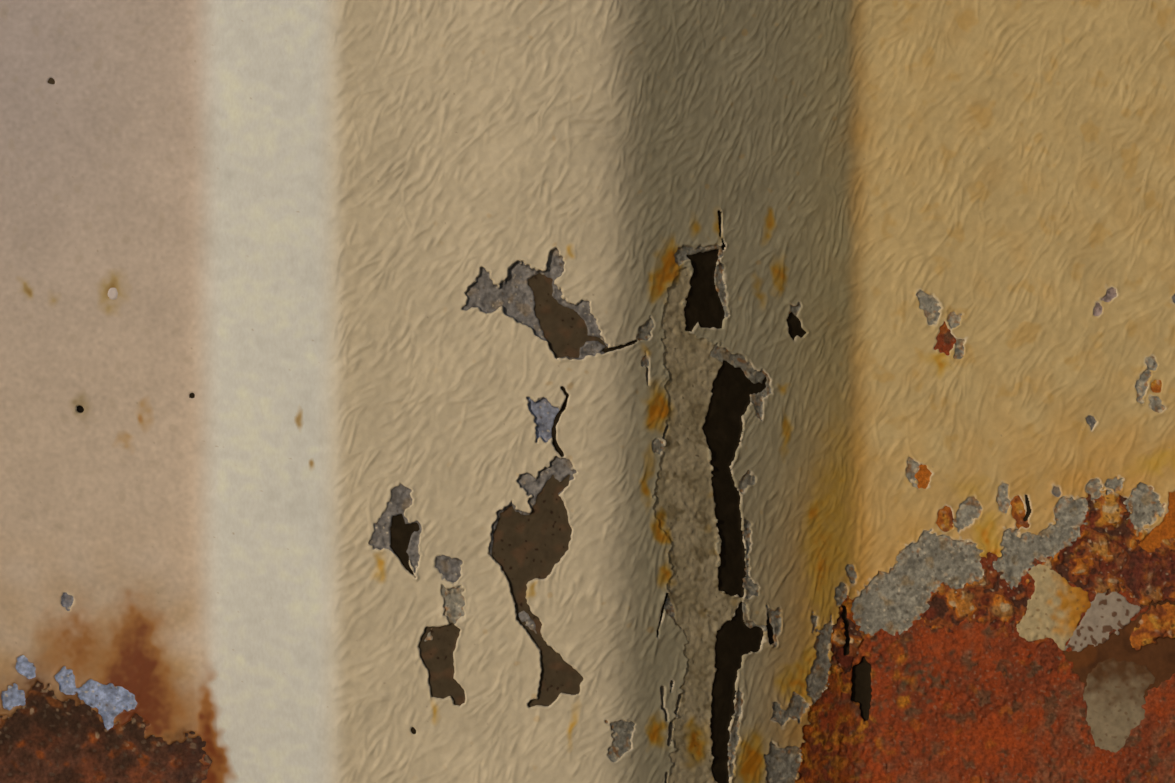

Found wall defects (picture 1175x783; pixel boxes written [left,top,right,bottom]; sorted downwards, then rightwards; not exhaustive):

rust [645,204,723,317]
rust [759,205,791,301]
peeling [787,302,806,340]
peeling [916,290,965,359]
rust [0,578,239,783]
peeling [368,483,422,578]
peeling [418,555,465,706]
peeling [462,248,782,783]
rust [638,368,678,595]
rust [729,386,1175,783]
peeling [996,483,1032,529]
rust [644,707,713,773]